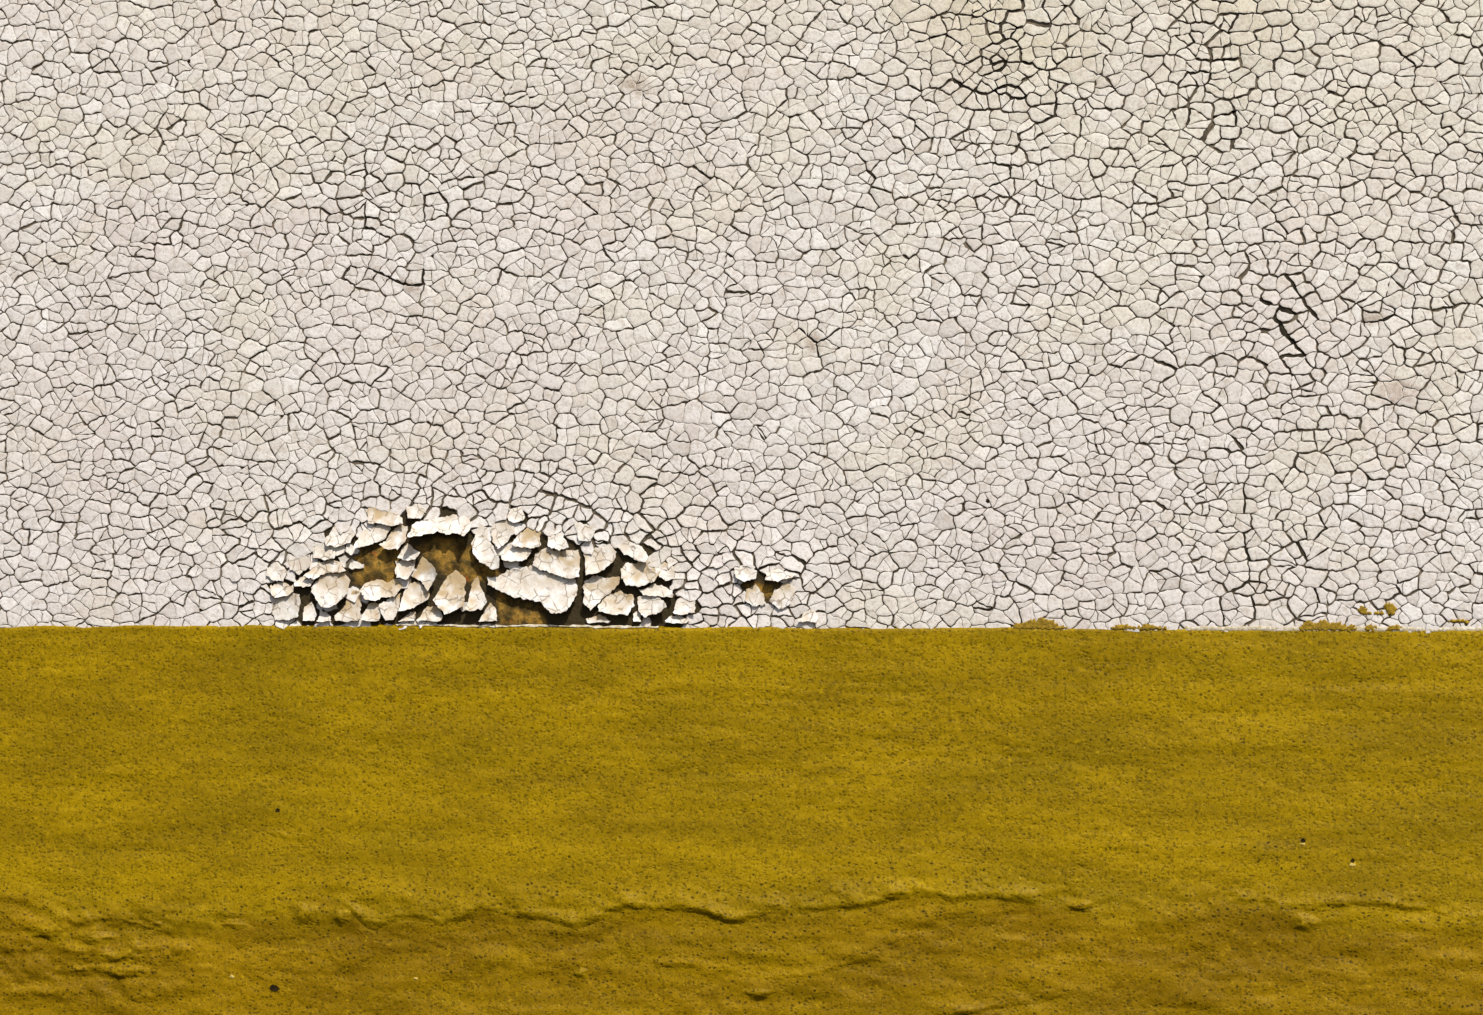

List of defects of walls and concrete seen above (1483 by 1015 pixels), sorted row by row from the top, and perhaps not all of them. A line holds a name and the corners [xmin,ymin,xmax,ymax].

crack [0,0,1483,629]
peeling [262,502,705,629]
spalling [729,564,818,623]